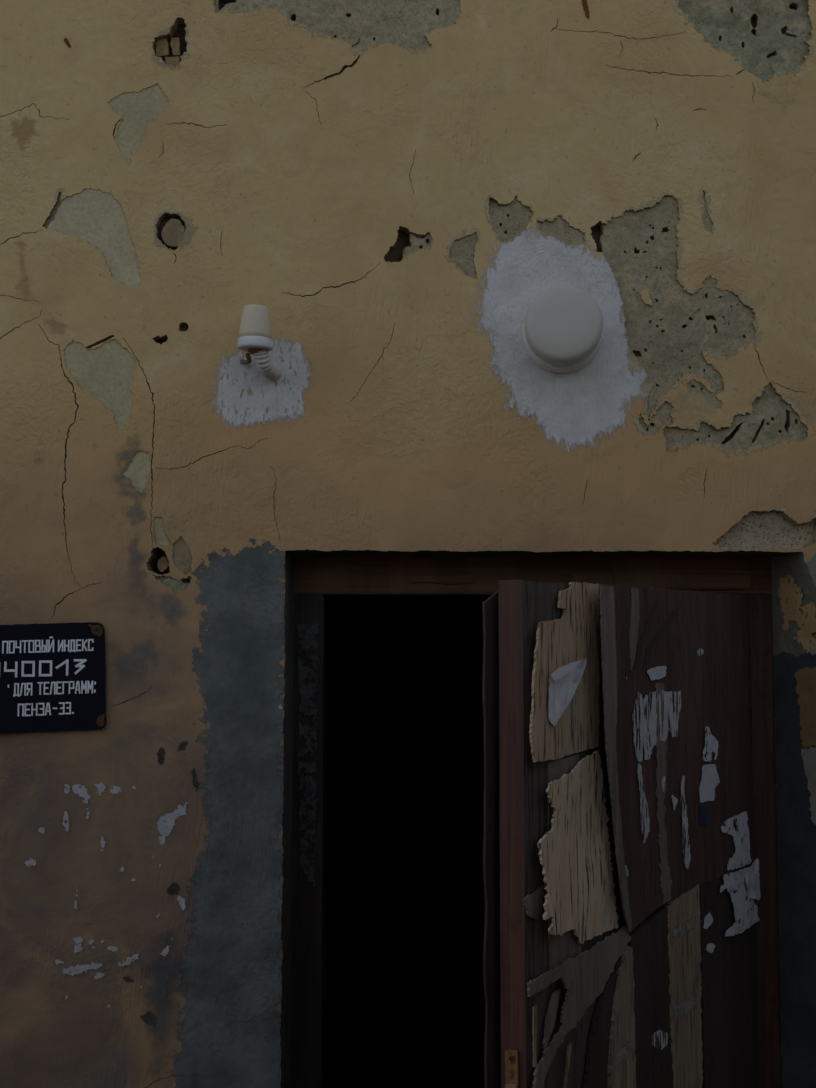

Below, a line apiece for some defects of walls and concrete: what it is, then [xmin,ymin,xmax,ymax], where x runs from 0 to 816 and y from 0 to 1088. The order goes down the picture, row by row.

spalling [152,17,187,66]
flaking render [212,0,462,56]
crack [550,17,756,104]
flaking render [673,0,816,83]
peeling [42,188,142,290]
crack [282,263,380,297]
flaking render [384,226,433,263]
flaking render [445,228,480,279]
flaking render [485,189,811,456]
flaking render [712,507,816,551]